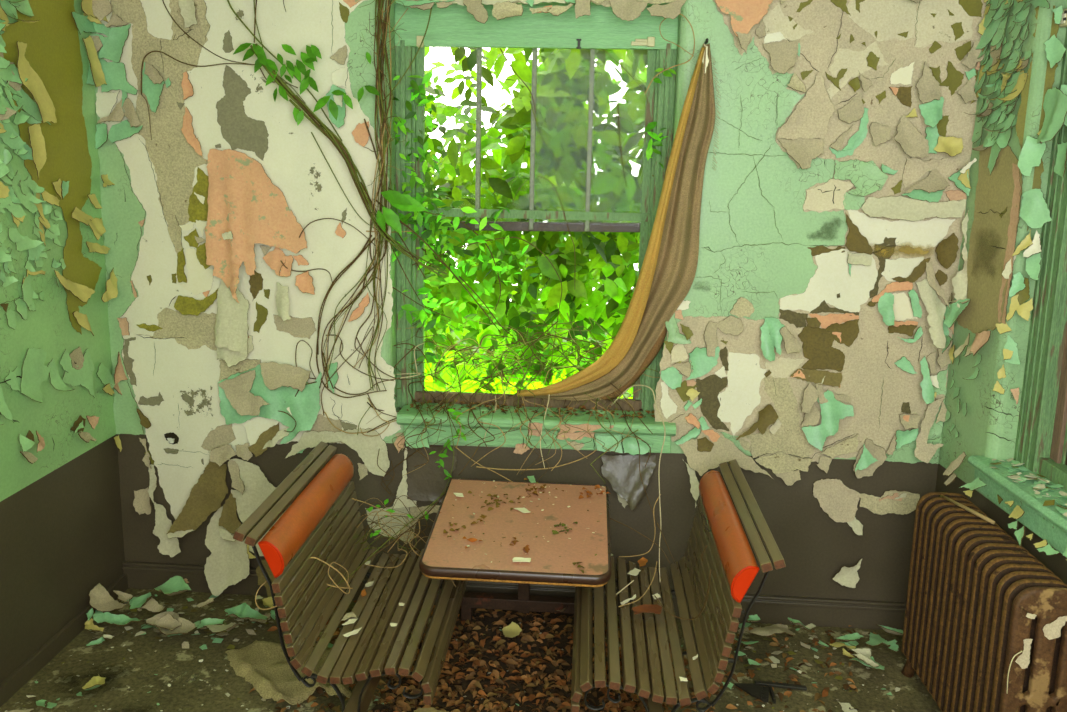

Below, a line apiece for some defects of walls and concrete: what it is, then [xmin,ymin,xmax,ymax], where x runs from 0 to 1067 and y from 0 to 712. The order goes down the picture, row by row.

flaking render [653,0,1067,535]
flaking render [0,0,440,597]
peeling [514,422,543,455]
peeling [556,424,653,455]
peeling [997,495,1067,560]
peeling [832,559,862,588]
peeling [341,612,362,637]